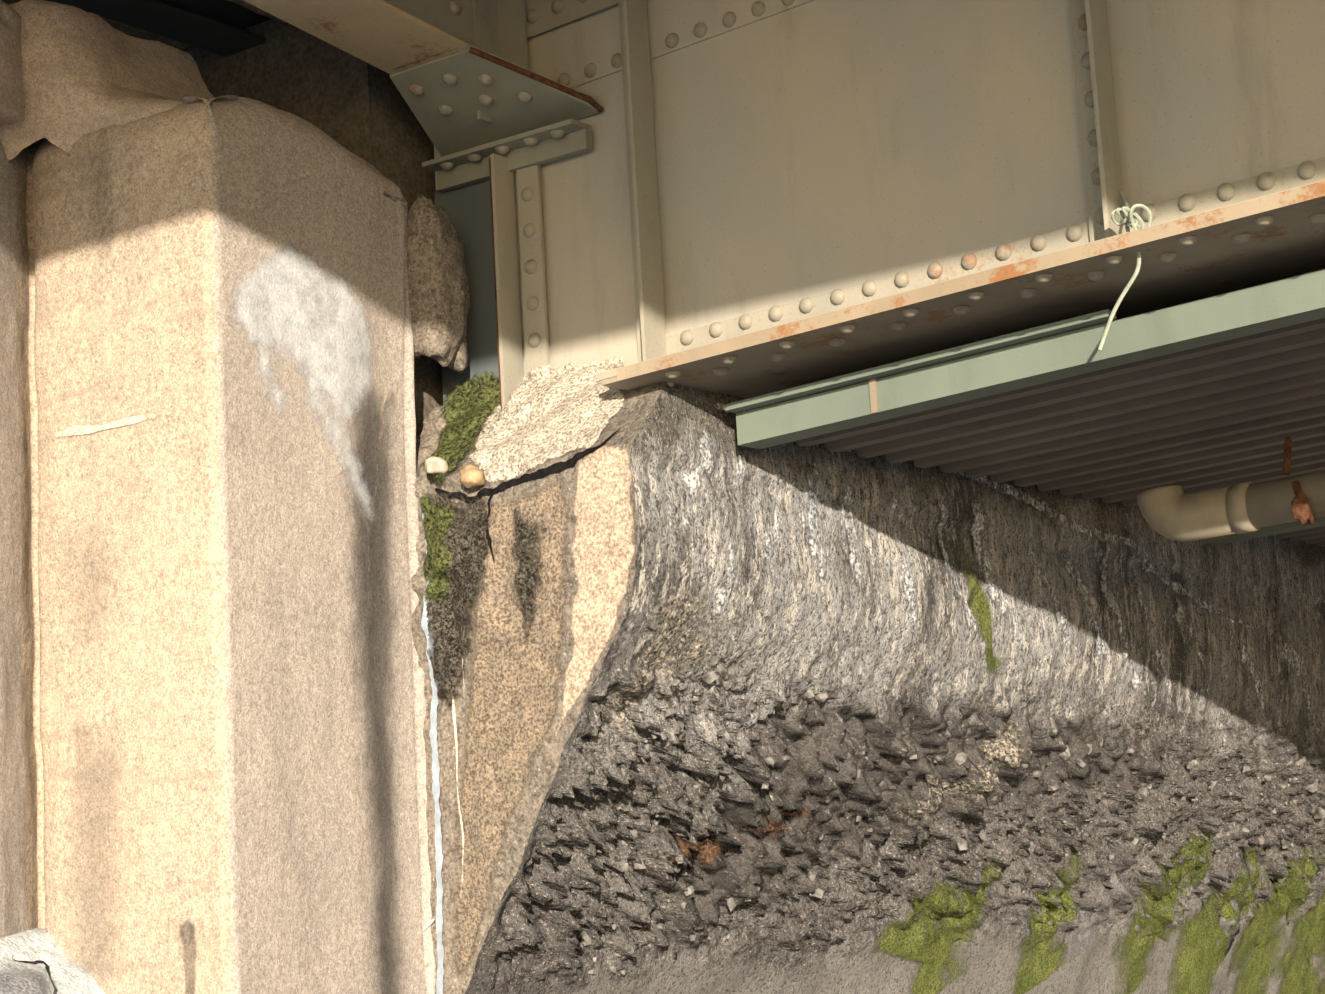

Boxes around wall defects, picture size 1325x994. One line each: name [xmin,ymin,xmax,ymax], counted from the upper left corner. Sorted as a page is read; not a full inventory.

rust [469,47,603,113]
rust [617,181,1325,381]
leakage [235,246,391,854]
crack [435,427,621,563]
leakage [379,880,396,994]
leakage [1064,861,1137,955]
leakage [1215,855,1265,950]